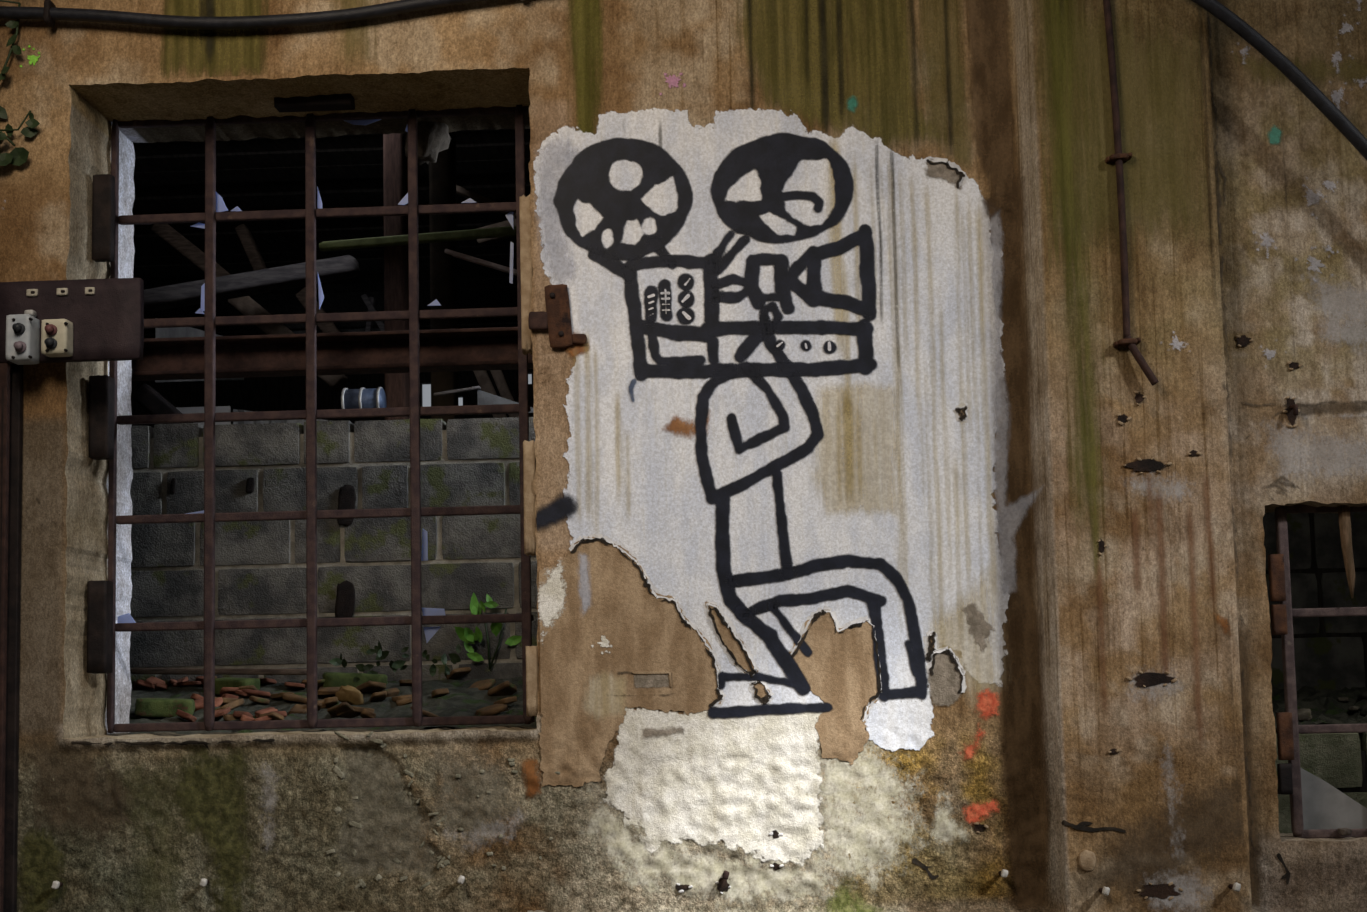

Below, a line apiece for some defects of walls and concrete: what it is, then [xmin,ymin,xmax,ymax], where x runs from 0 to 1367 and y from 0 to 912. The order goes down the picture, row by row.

water stain [806,0,843,127]
rust [565,332,589,357]
spalling [1123,457,1172,474]
peeling [539,534,774,787]
peeling [789,606,883,765]
spalling [1126,671,1177,688]